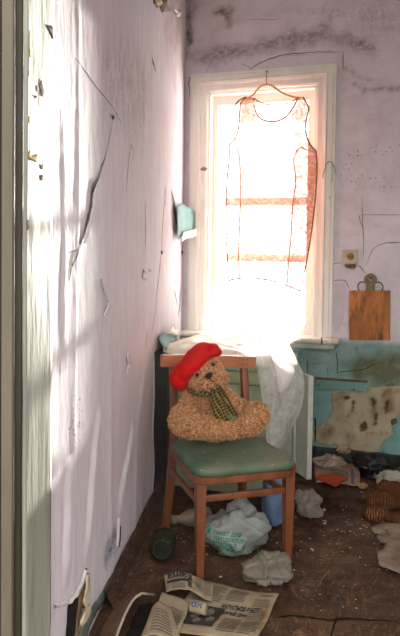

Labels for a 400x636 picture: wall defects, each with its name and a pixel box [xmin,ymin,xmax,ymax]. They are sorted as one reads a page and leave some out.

crack [68,58,121,280]
crack [357,213,400,272]
flaking render [312,385,400,455]
peeling [79,573,107,636]